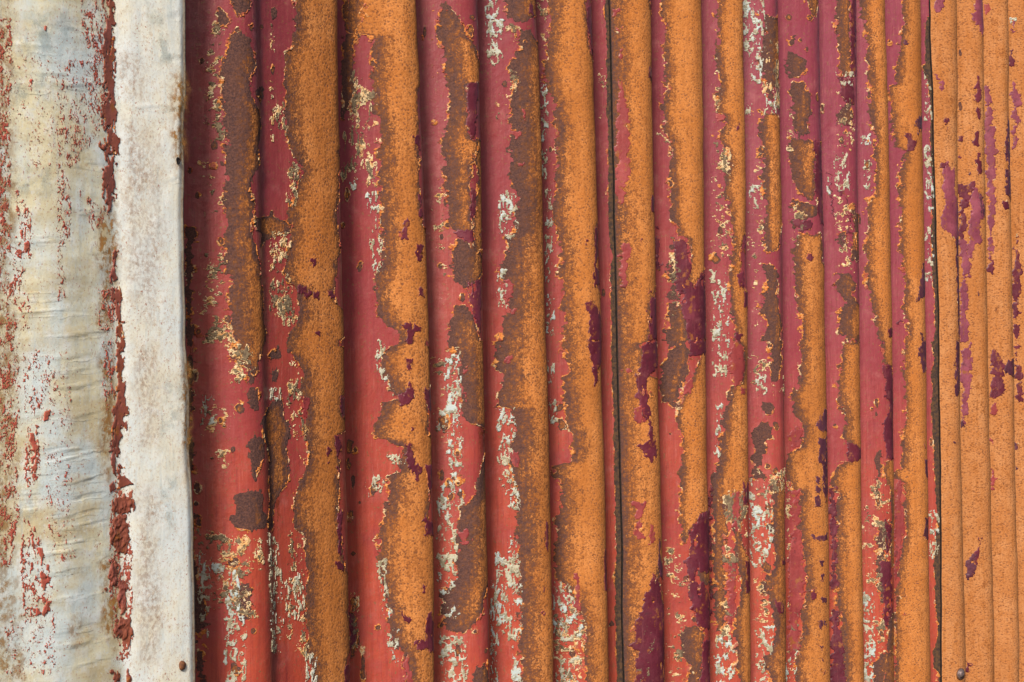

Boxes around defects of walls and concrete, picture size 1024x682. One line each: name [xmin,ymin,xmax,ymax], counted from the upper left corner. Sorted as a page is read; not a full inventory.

peeling [743,0,795,152]
peeling [826,71,872,273]
peeling [0,0,120,675]
peeling [98,249,133,663]
peeling [269,361,309,464]
peeling [432,347,465,595]
corrosion [209,0,941,682]
peeling [709,269,730,377]
peeling [194,529,318,682]
peeling [438,632,469,682]
peeling [635,540,695,682]
peeling [713,468,793,682]